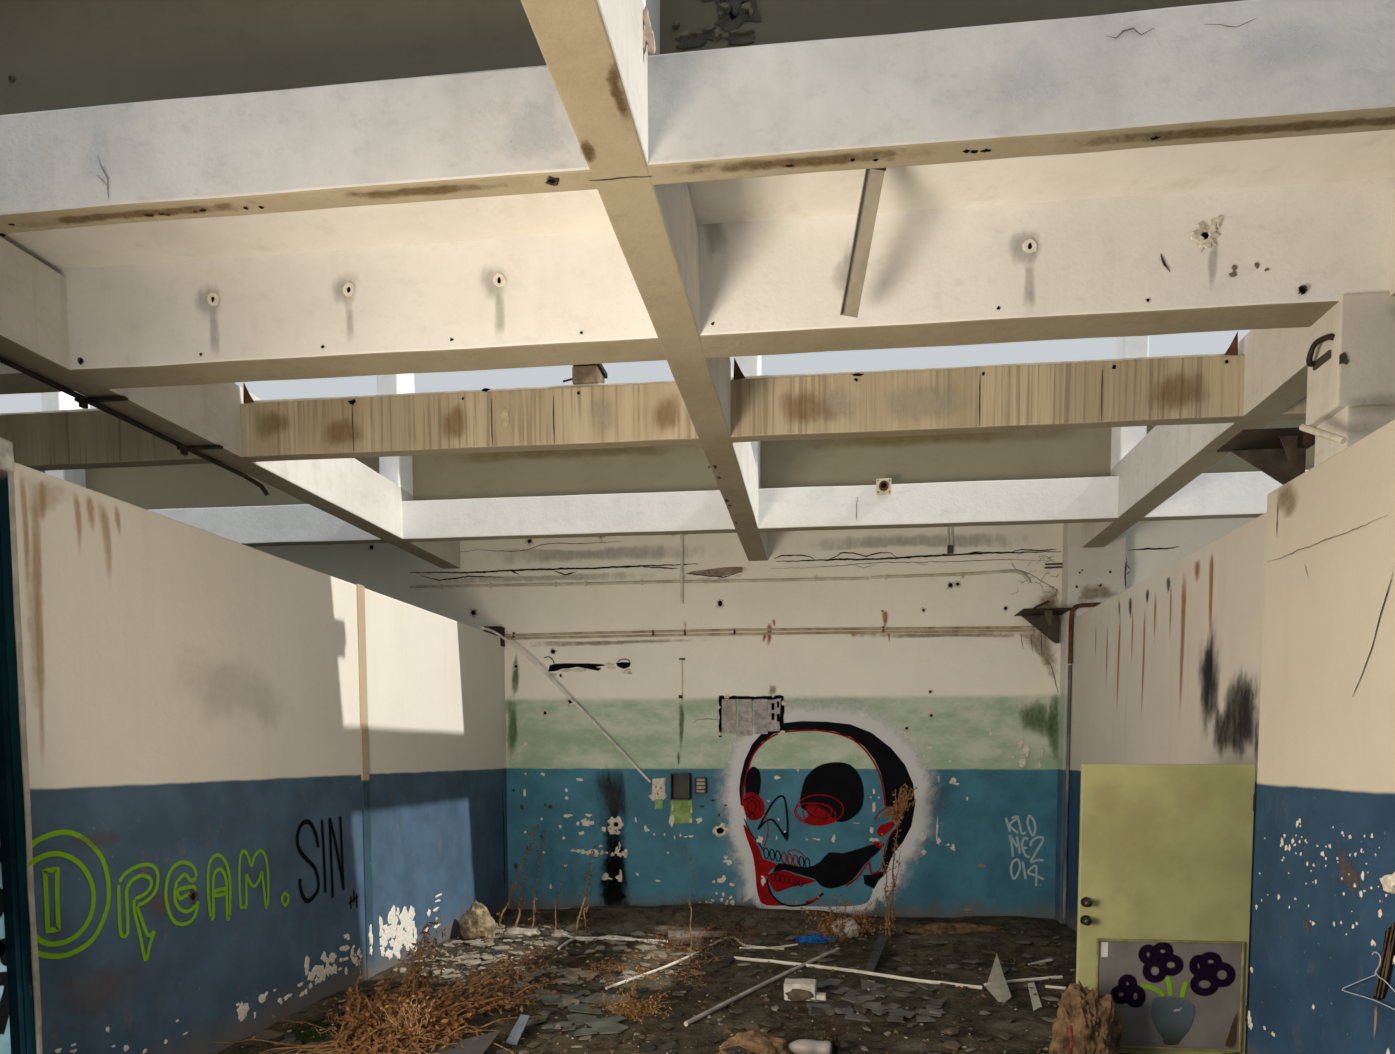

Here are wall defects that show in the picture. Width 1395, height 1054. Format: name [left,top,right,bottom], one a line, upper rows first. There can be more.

spalling [643,6,656,54]
peeling [672,0,761,51]
rust [76,499,120,550]
rust [22,488,44,673]
rust [1095,557,1213,694]
water stain [1023,705,1049,732]
peeling [236,894,442,1022]
peeling [524,778,729,882]
peeling [698,856,735,905]
spalling [1264,818,1395,1000]